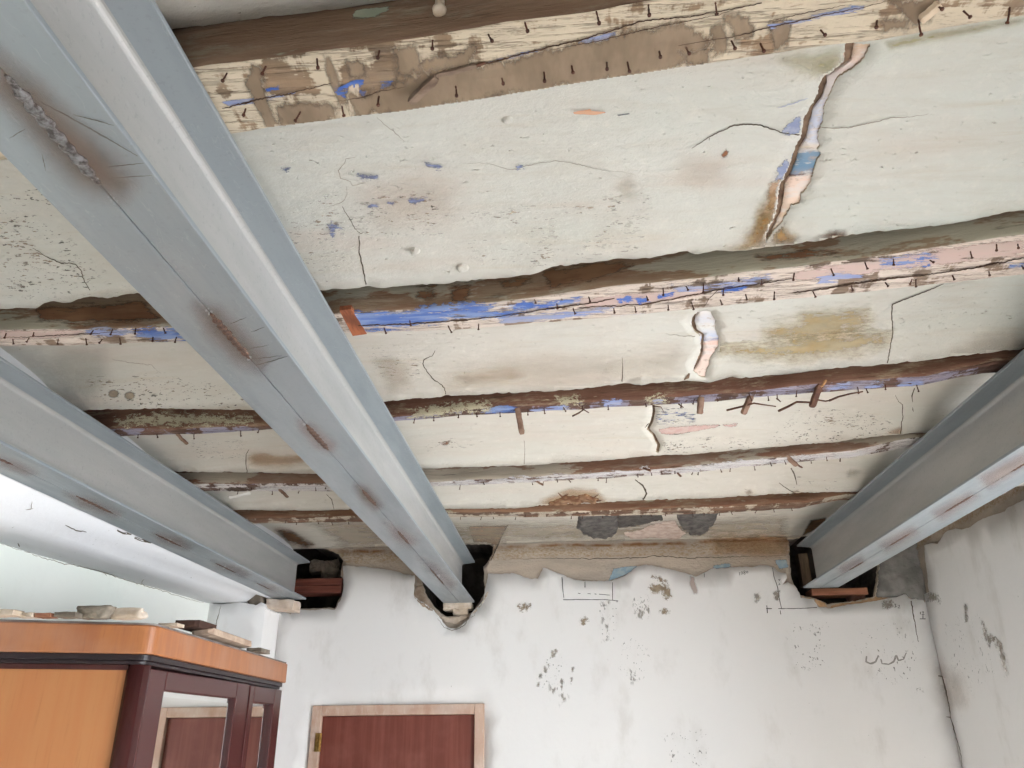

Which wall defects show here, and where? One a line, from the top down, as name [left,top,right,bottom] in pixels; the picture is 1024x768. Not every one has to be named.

crack [328,157,367,285]
crack [472,160,620,172]
damp [742,204,795,248]
crack [693,43,927,238]
crack [887,284,943,363]
spalling [278,518,891,631]